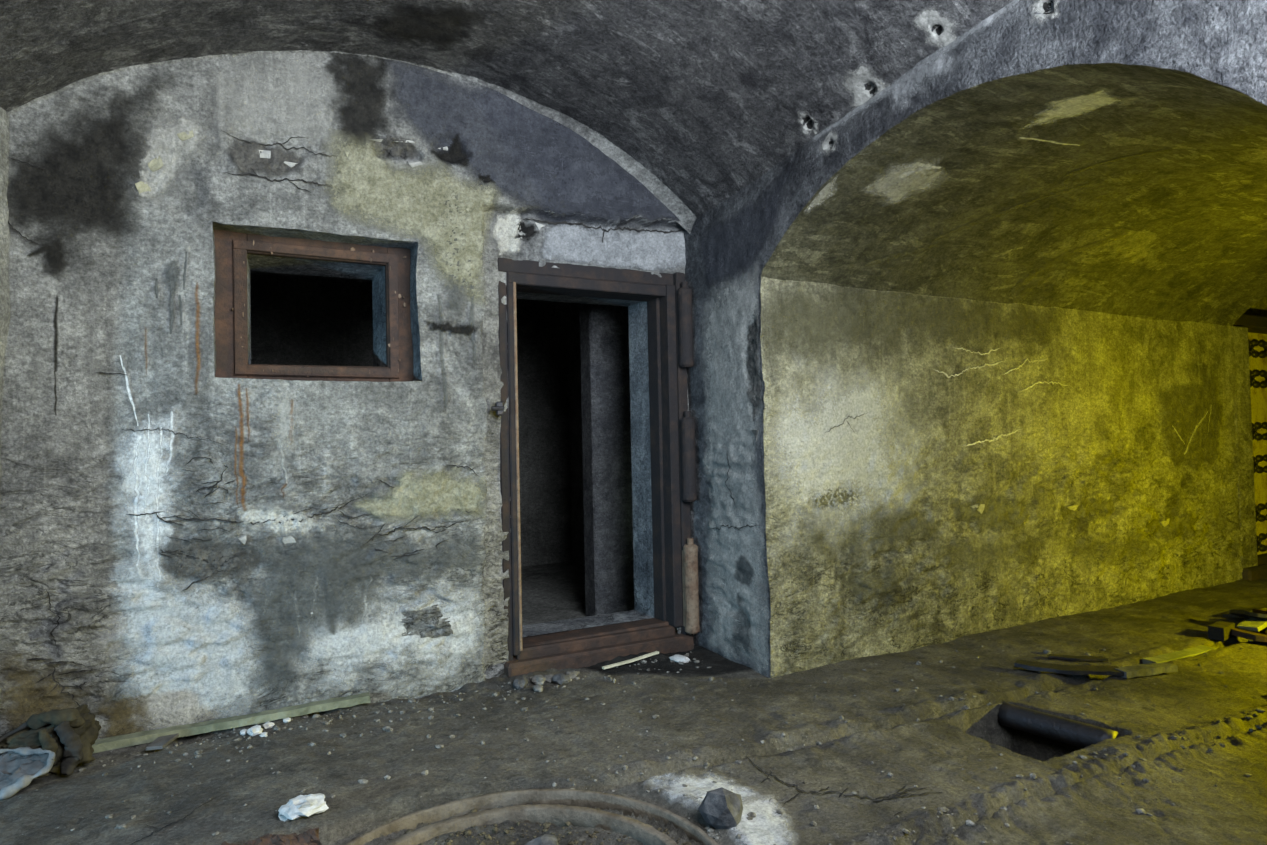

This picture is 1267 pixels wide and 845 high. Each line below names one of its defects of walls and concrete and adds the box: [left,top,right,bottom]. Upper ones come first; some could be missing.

spalling [229,141,303,175]
crack [122,428,472,591]